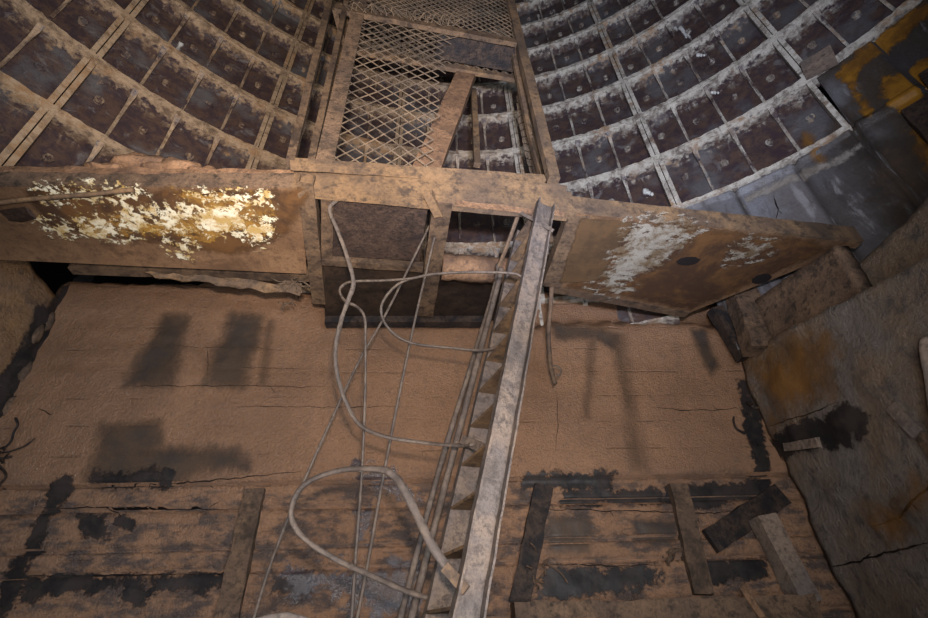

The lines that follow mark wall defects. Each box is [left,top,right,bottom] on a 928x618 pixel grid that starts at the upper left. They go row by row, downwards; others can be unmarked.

rust [836,4,928,117]
peeling [28,178,277,265]